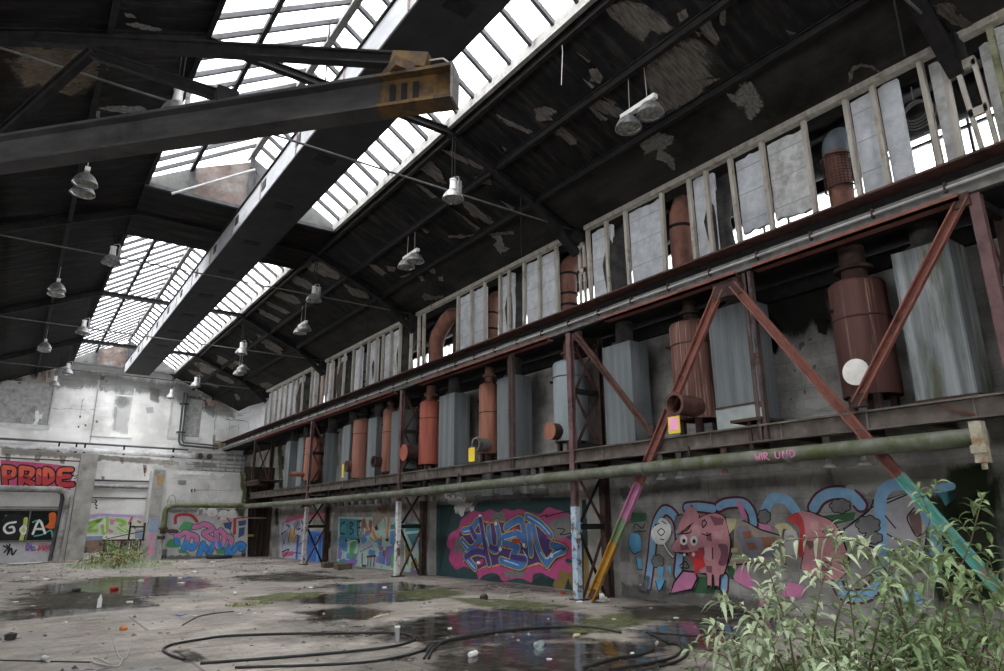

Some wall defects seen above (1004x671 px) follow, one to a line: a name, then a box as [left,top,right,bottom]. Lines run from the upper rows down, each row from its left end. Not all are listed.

peeling [577,52,603,88]
peeling [605,0,726,113]
peeling [726,81,764,120]
peeling [495,106,578,145]
peeling [442,149,492,185]
peeling [639,132,676,171]
peeling [447,200,514,254]